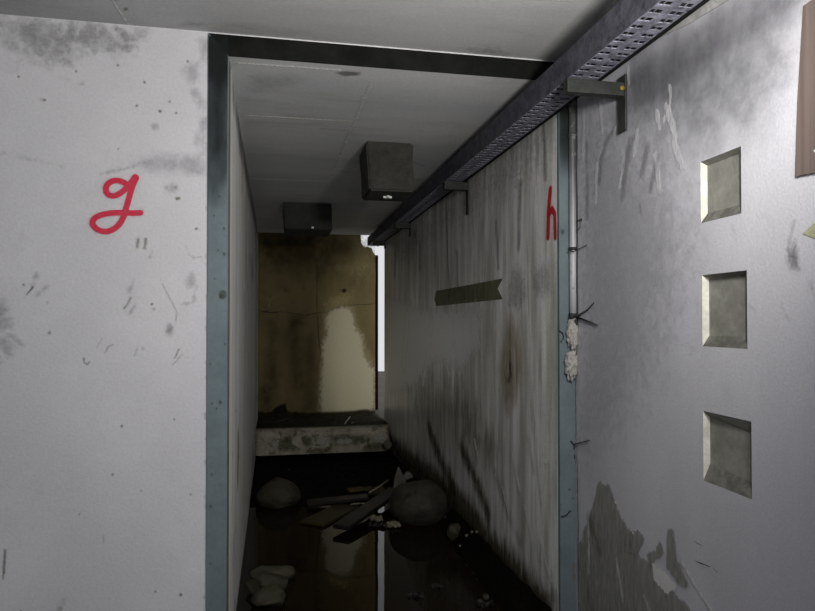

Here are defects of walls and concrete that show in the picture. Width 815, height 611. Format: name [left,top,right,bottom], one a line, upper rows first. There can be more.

peeling [578,481,690,611]